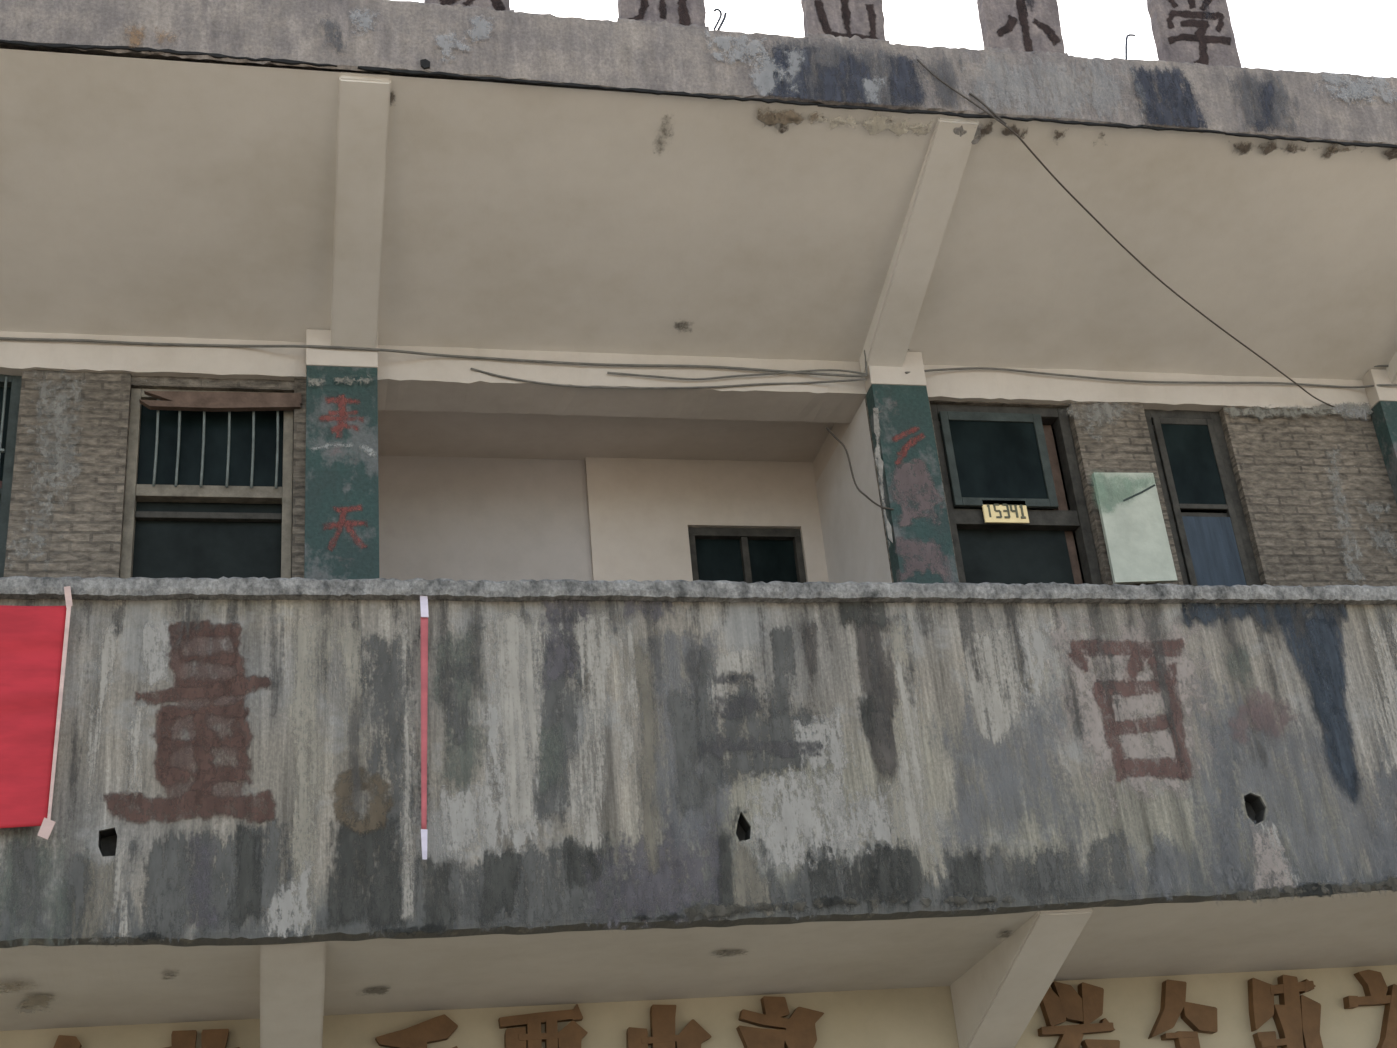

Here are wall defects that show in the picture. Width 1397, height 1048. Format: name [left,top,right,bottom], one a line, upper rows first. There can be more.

peeling [706,31,824,133]
damp [765,37,962,107]
peeling [863,79,885,103]
damp [1131,65,1207,128]
damp [1231,71,1299,132]
spalling [1234,142,1306,155]
spalling [1323,143,1349,158]
damp [0,598,1397,944]
spalling [1222,876,1397,902]